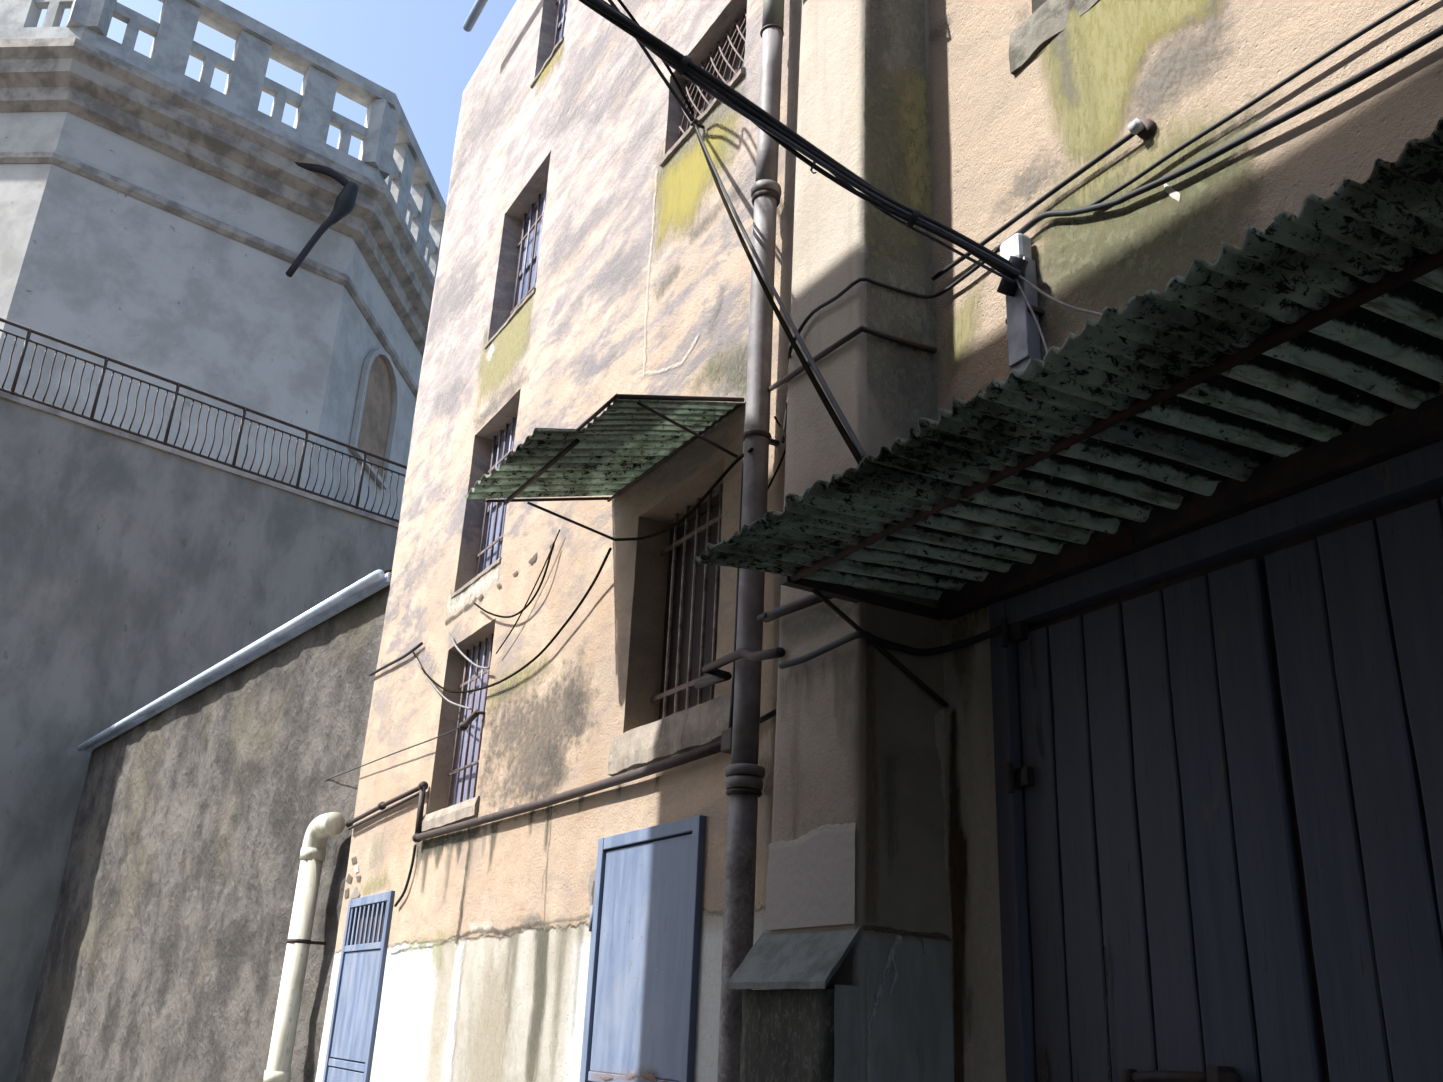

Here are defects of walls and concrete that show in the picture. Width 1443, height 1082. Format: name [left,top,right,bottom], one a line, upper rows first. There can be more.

damp [1037,0,1257,343]
damp [478,650,597,844]
damp [415,823,497,890]
damp [526,925,581,1082]
crack [863,925,951,1039]